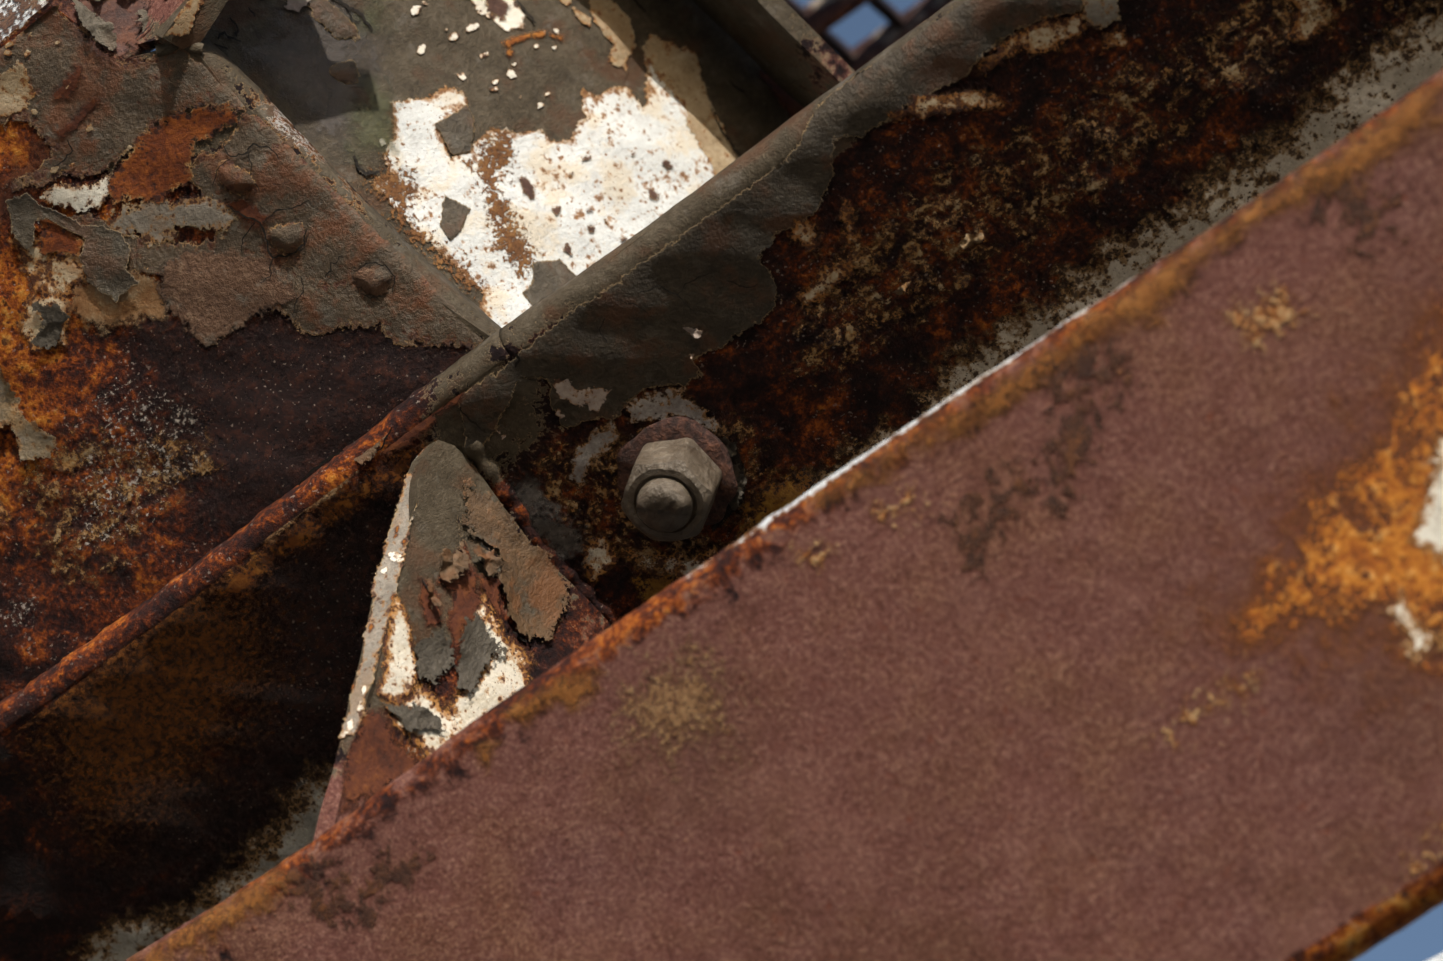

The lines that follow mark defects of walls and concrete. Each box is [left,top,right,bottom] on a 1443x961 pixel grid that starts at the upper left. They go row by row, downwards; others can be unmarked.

corrosion [0,0,48,40]
corrosion [69,0,153,64]
corrosion [105,101,239,205]
peeling [0,0,483,352]
corrosion [485,0,511,21]
peeling [0,368,223,586]
corrosion [7,392,464,909]
corrosion [66,249,471,523]
corrosion [417,541,502,659]
peeling [338,0,1443,757]
corrosion [711,80,1443,582]
corrosion [1143,294,1443,755]